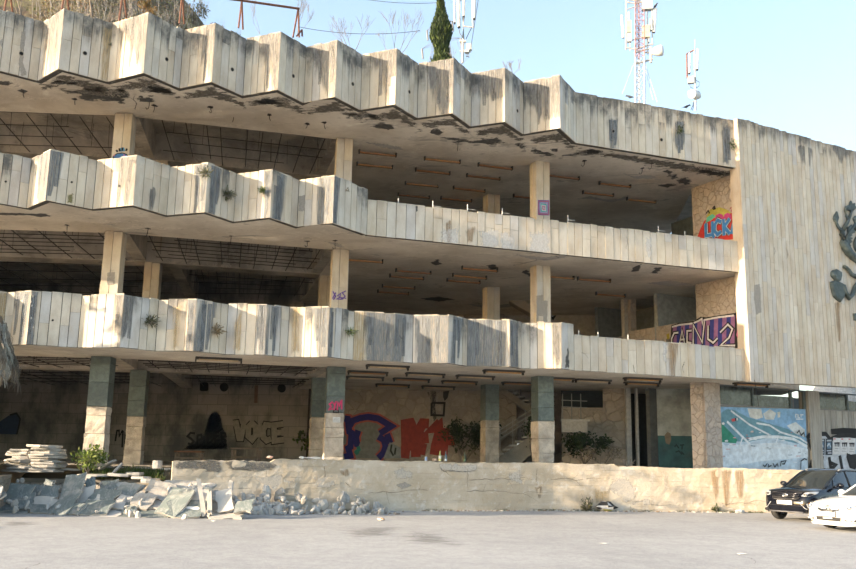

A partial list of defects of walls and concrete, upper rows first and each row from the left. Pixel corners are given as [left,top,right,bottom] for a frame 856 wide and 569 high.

leakage [45,10,64,75]
leakage [124,14,148,73]
leakage [609,119,618,148]
leakage [675,121,685,153]
leakage [723,127,731,164]
leakage [36,150,64,203]
leakage [116,156,137,206]
leakage [193,164,222,215]
leakage [264,170,285,220]
leakage [312,307,336,357]
leakage [354,312,518,367]
leakage [552,323,562,368]